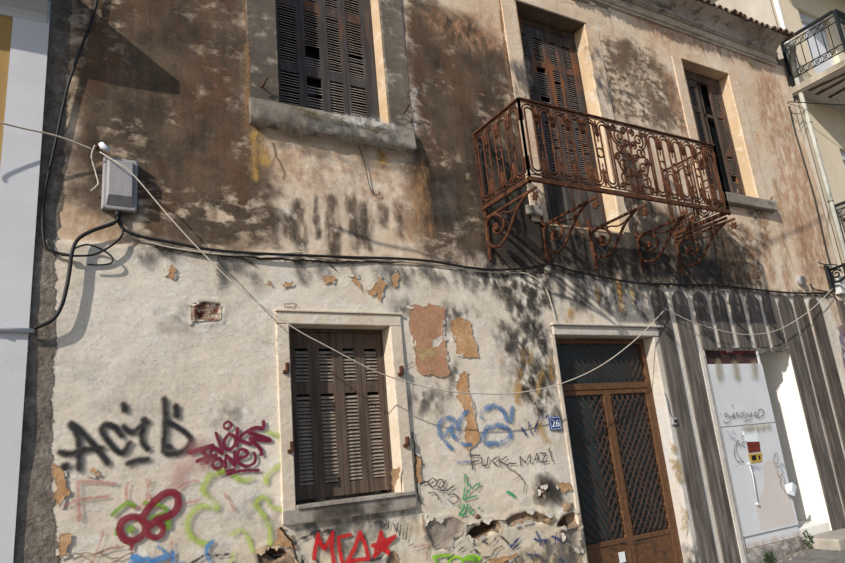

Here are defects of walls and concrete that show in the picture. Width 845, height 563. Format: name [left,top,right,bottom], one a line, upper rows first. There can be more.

damp [66,0,309,285]
damp [313,0,830,299]
peeling [348,269,400,301]
flaking render [188,300,222,325]
peeling [407,303,480,451]
peeling [51,463,70,509]
peeling [56,533,72,560]
flaking render [255,527,300,563]
flaking render [385,550,399,563]
flaking render [423,482,584,563]